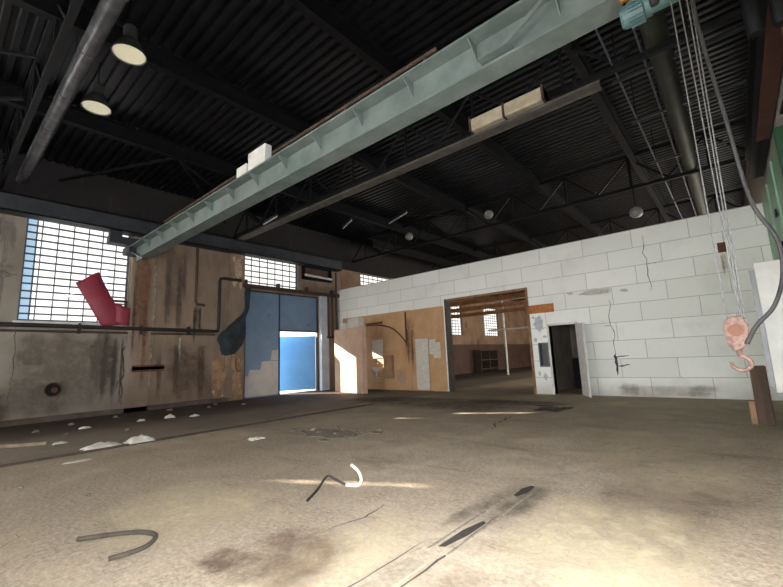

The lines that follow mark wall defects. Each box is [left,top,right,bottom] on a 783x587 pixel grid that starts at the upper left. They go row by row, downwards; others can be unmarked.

damp [92,335,123,395]
crack [605,301,630,375]